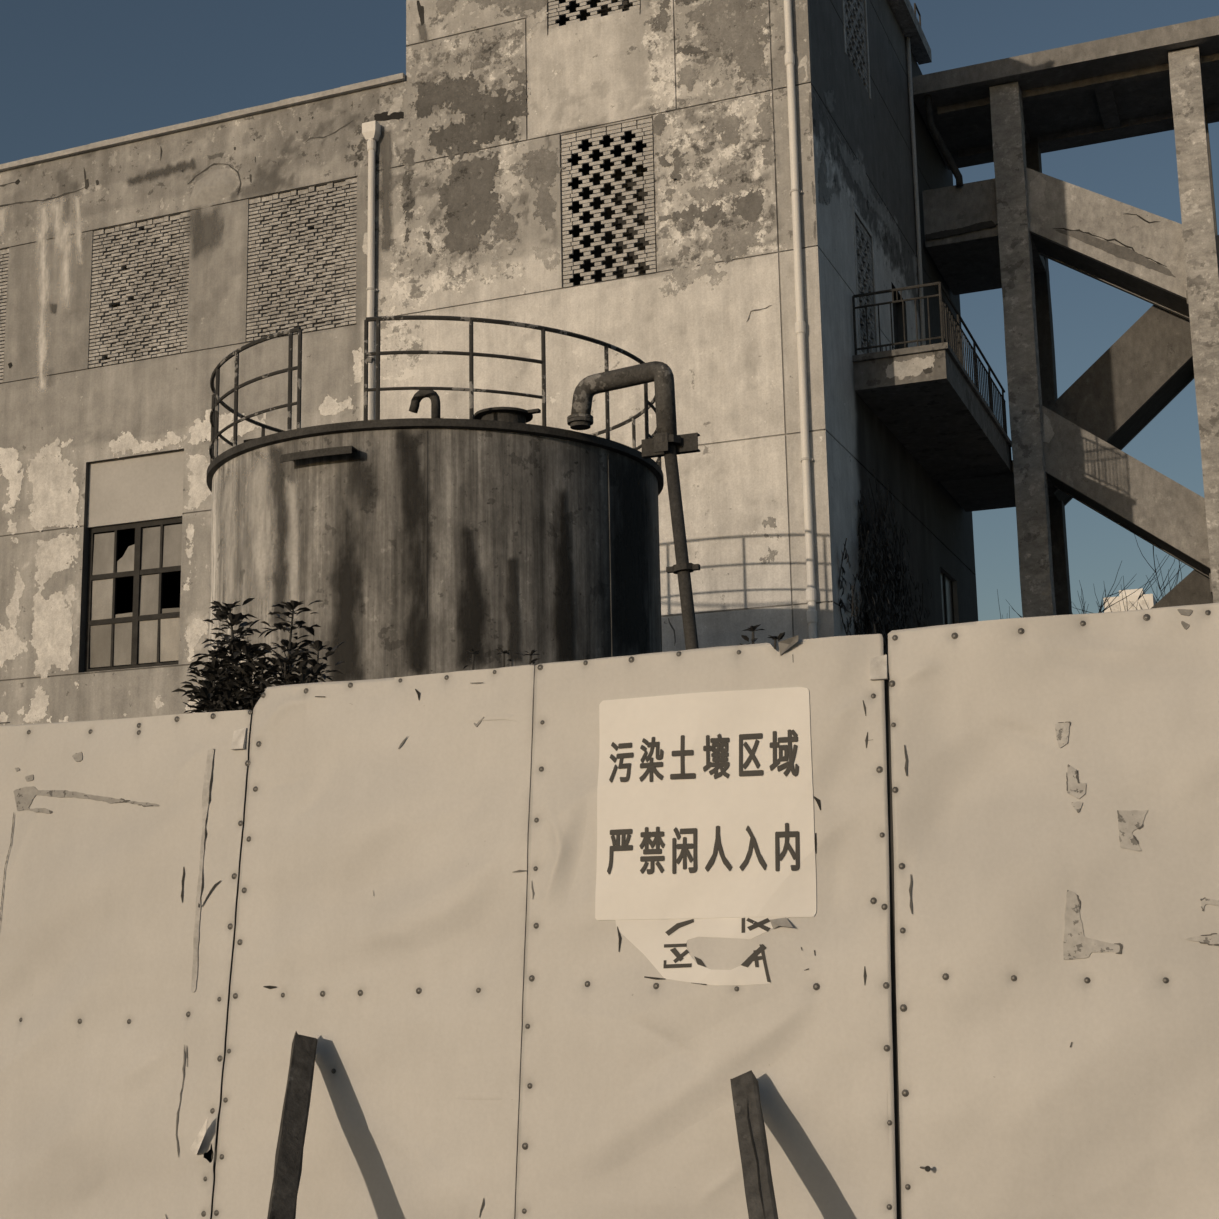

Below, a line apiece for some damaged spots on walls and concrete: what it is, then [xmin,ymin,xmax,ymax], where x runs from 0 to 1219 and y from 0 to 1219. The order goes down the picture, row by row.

leakage [38,196,82,390]
peeling [319,347,364,416]
peeling [0,437,82,725]
peeling [109,409,266,591]
corrosion [221,447,299,622]
corrosion [331,515,362,681]
corrosion [396,431,430,673]
corrosion [458,531,487,665]
corrosion [506,559,521,661]
corrosion [555,492,574,661]
corrosion [614,458,649,654]